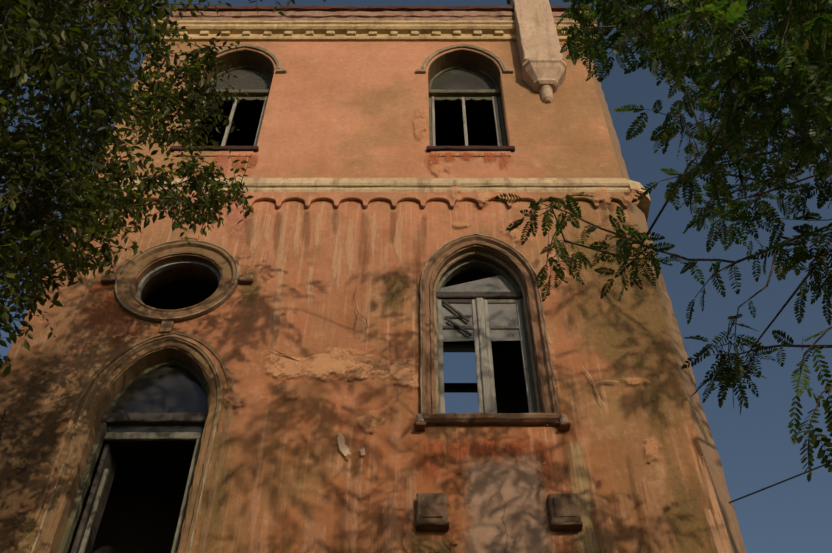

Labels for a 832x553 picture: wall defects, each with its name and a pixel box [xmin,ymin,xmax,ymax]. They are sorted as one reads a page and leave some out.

peeling [476,189,492,202]
leakage [229,205,301,346]
peeling [267,348,419,398]
leakage [569,239,668,416]
spalling [334,432,365,458]
leakage [568,441,604,553]
leakage [669,457,730,553]